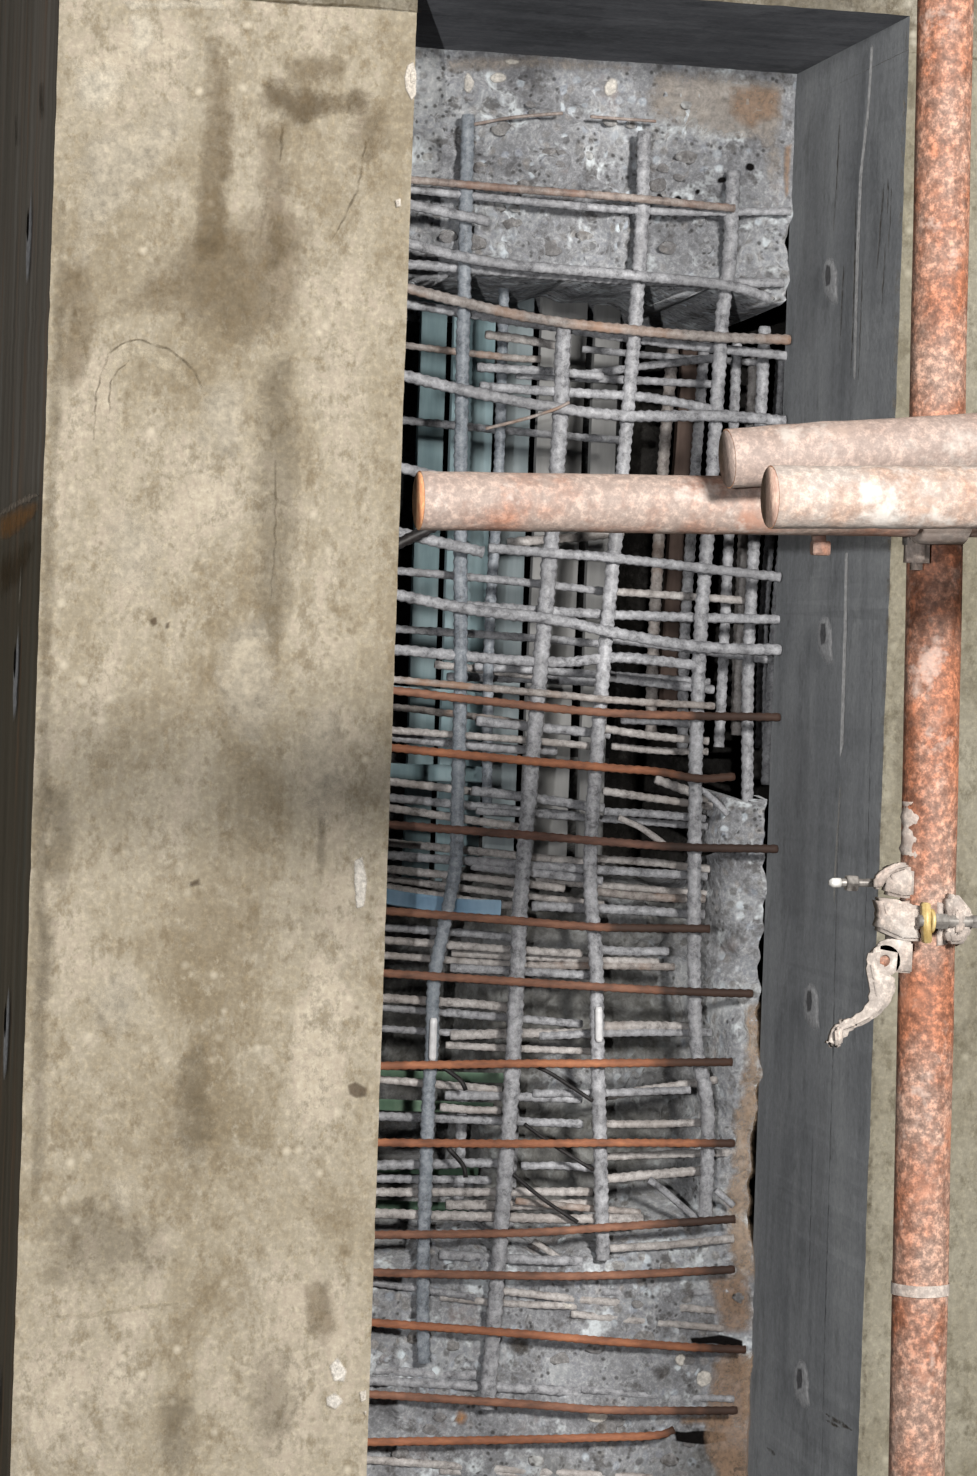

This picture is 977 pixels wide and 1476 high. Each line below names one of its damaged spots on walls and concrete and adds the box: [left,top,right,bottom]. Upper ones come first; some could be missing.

spalling [396,47,797,477]
spalling [360,527,782,1476]
corrosion [714,1012,758,1329]
corrosion [685,1353,753,1476]